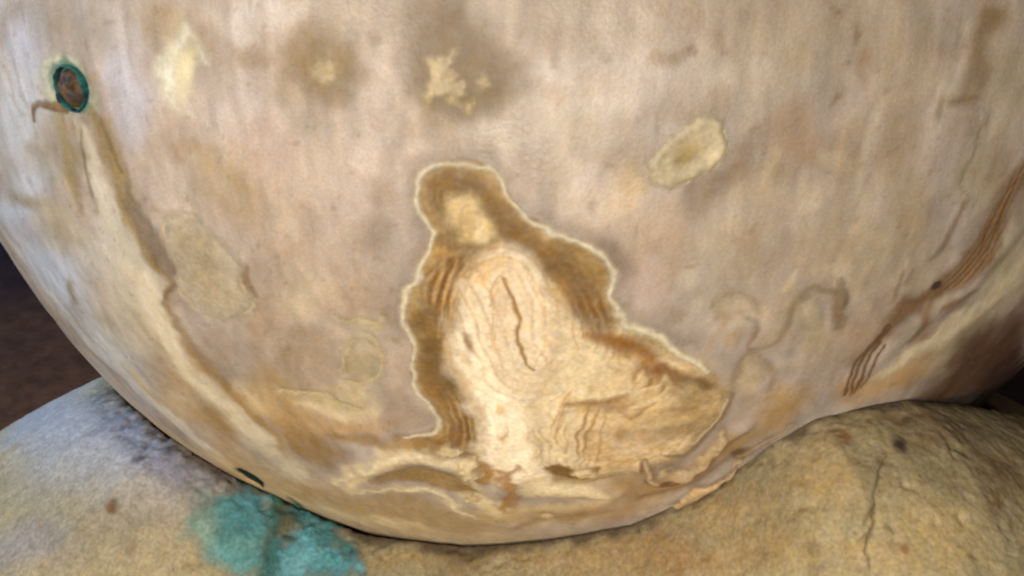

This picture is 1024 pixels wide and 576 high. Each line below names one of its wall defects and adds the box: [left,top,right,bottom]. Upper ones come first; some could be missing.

peeling [423,49,491,114]
rust [31,68,226,385]
crack [504,281,530,368]
spalling [640,396,793,509]